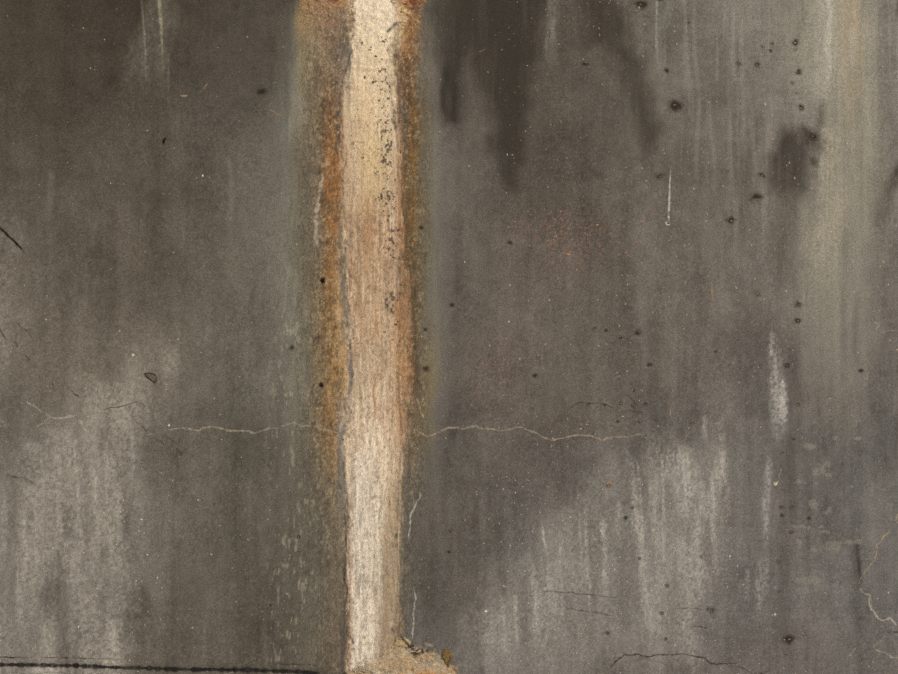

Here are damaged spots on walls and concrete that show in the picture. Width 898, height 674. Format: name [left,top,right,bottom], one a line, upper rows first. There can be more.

crack [24,382,338,455]
corrosion [291,0,357,674]
spalling [339,636,465,674]
corrosion [389,0,436,640]
leakage [334,0,686,673]
crack [415,394,672,441]
leakage [452,387,745,674]
leakage [724,0,898,659]
crack [859,513,898,659]